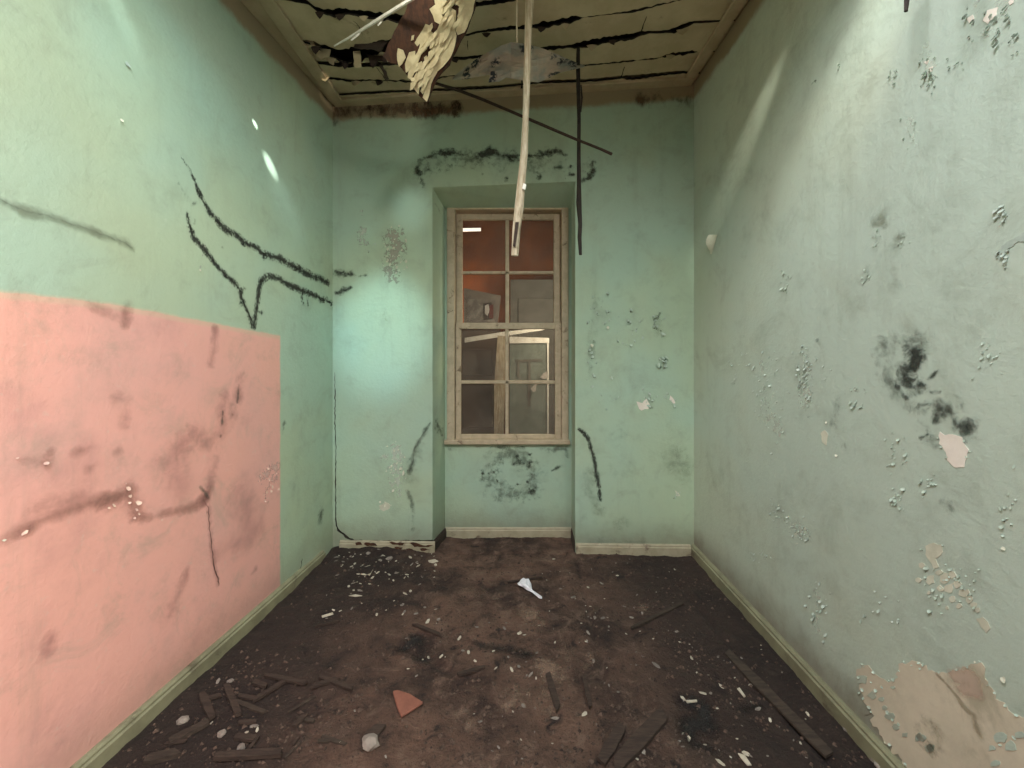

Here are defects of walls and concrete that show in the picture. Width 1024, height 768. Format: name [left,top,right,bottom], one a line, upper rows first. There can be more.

peeling [410,0,465,91]
peeling [961,0,1019,56]
leakage [415,147,596,184]
crack [184,161,333,329]
leakage [889,345,937,400]
crack [334,372,354,540]
crack [578,428,602,501]
leakage [920,405,972,438]
flaking render [937,432,971,468]
crack [203,490,219,583]
peeling [915,543,991,633]
flaking render [856,660,1024,768]